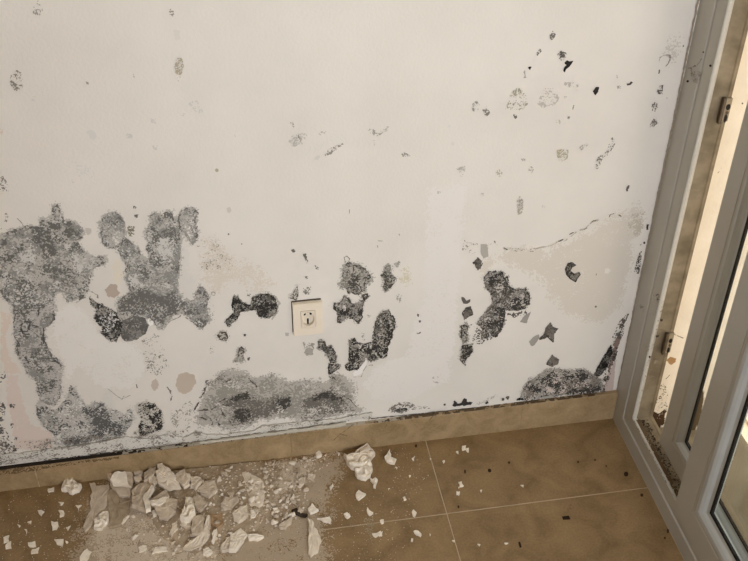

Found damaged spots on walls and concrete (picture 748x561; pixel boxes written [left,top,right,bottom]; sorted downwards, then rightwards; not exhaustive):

water stain [0,201,413,454]
water stain [443,200,653,407]